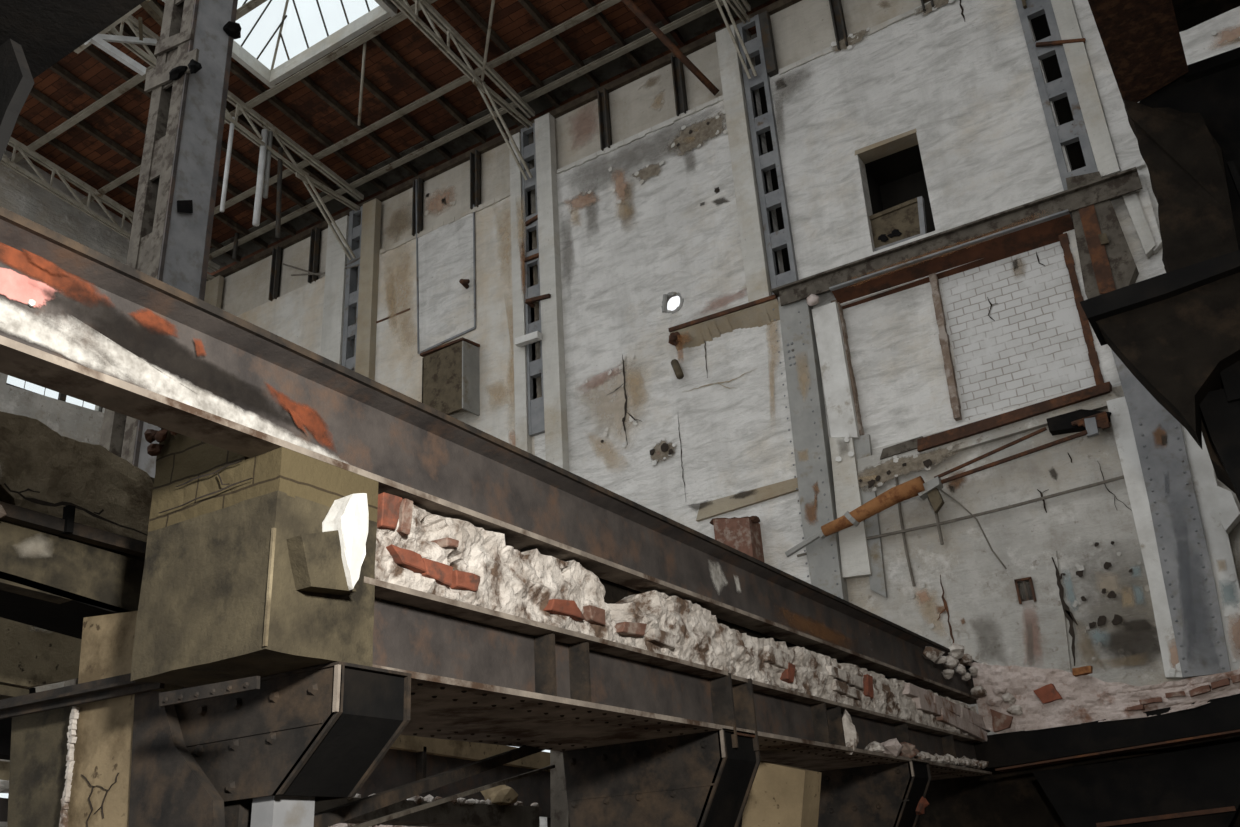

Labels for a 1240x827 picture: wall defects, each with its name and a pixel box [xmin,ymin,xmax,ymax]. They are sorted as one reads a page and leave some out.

spalling [608,109,727,204]
corrosion [0,243,109,305]
crack [608,355,642,445]
spalling [650,437,676,465]
spalling [857,436,961,491]
spalling [375,492,990,743]
crack [1051,557,1078,666]
peeling [1065,541,1150,661]
damp [1109,620,1161,665]
spalling [59,707,79,827]
crack [81,773,119,827]